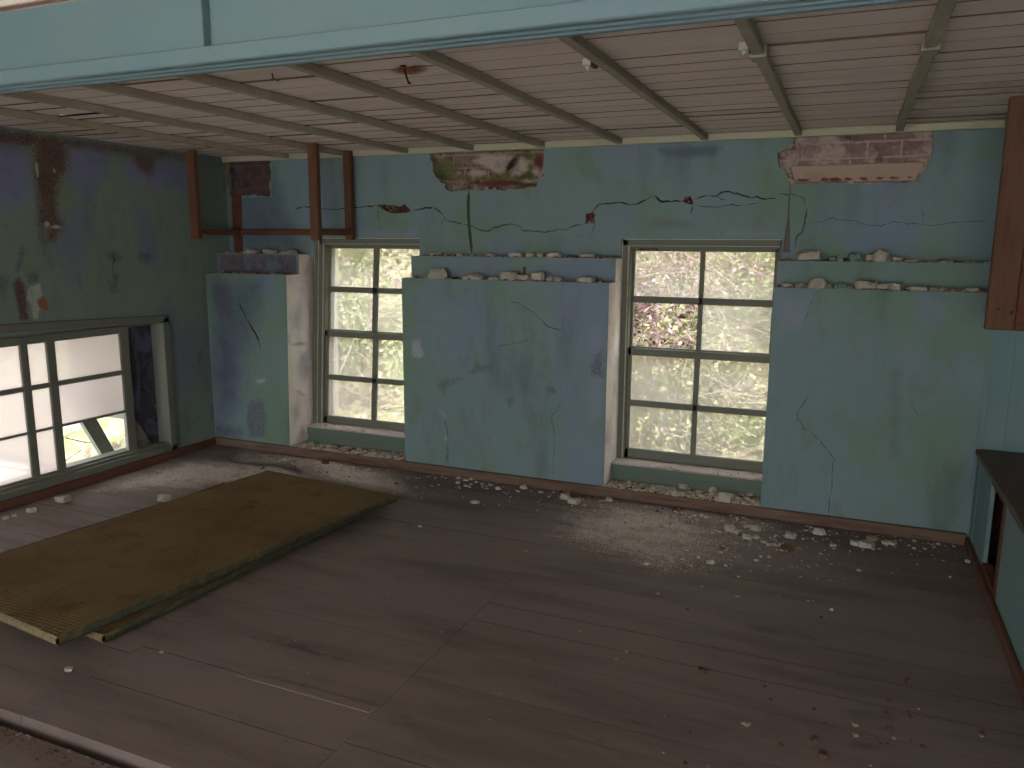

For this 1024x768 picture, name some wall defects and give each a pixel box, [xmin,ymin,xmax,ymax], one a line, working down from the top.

rust [388,65,426,75]
water stain [0,128,189,247]
spalling [226,161,271,197]
spalling [430,149,544,191]
spalling [777,131,934,184]
crack [411,190,990,253]